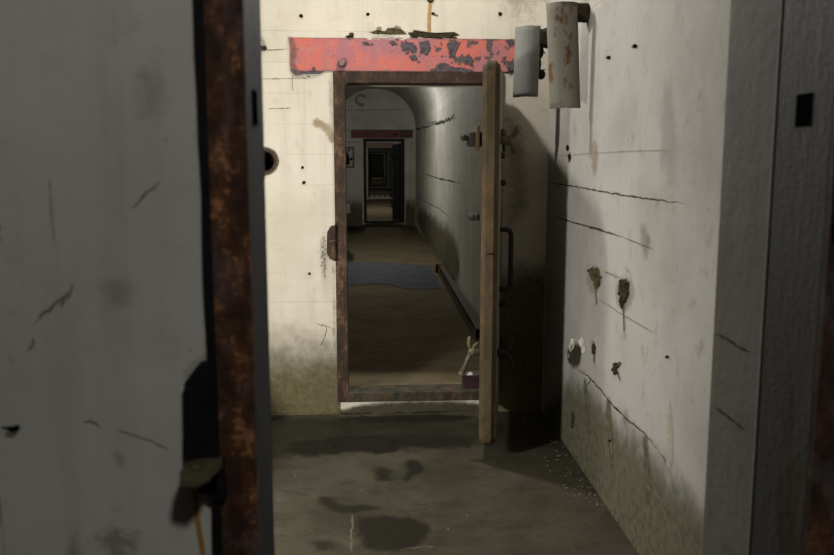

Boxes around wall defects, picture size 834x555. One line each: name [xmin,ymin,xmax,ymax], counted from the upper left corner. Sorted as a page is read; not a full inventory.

peeling [291,67,325,77]
spalling [345,26,476,72]
crack [558,217,654,250]
spalling [587,267,602,305]
spalling [617,278,629,331]
crack [715,333,750,352]
damp [270,353,479,422]
damp [498,270,703,555]
crack [577,369,665,461]
damp [292,435,468,456]
damp [321,497,428,550]